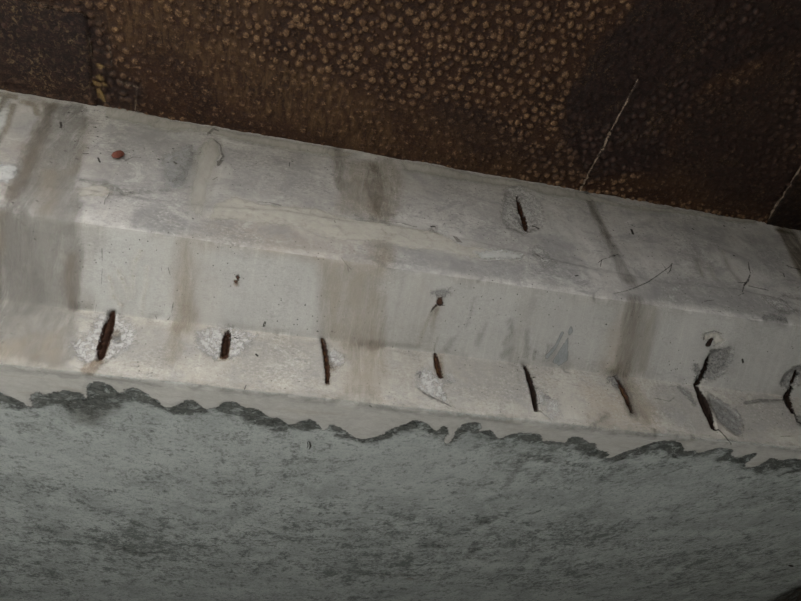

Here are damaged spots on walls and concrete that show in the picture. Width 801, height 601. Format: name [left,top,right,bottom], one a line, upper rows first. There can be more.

damp [0,105,109,363]
corrosion [502,187,543,234]
corrosion [68,311,136,369]
corrosion [195,326,258,360]
corrosion [321,338,344,384]
peeling [0,364,801,467]
corrosion [417,354,455,405]
corrosion [523,365,561,420]
corrosion [607,376,632,413]
corrosion [677,331,743,445]
corrosion [744,366,801,424]